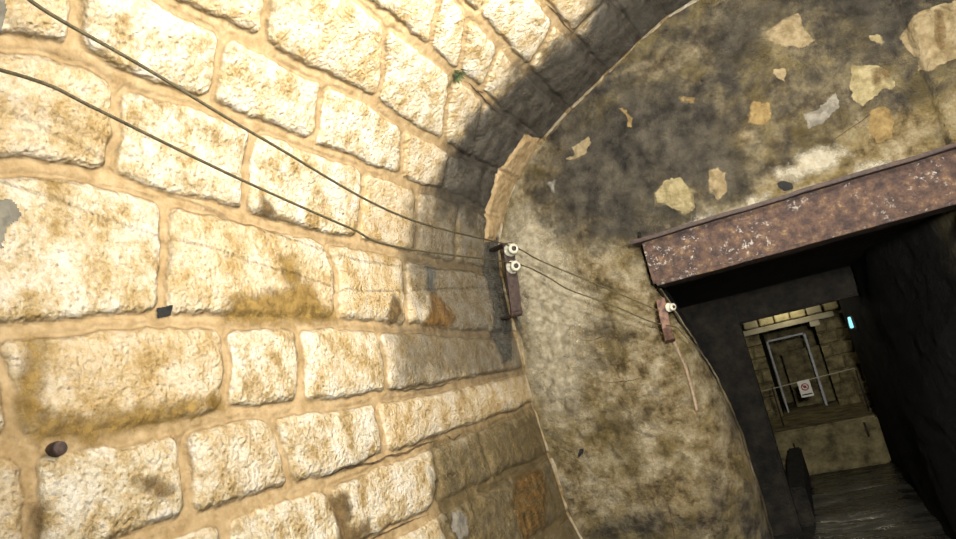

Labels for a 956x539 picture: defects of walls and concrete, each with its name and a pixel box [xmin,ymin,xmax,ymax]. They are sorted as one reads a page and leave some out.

damp [713,0,781,76]
spalling [765,13,815,48]
spalling [899,0,956,71]
spalling [747,101,771,126]
spalling [804,93,840,129]
spalling [849,65,895,143]
flaking render [566,136,591,160]
spalling [654,177,695,217]
spalling [707,168,728,200]
damp [776,147,846,181]
damp [483,208,595,410]
damp [432,405,580,539]